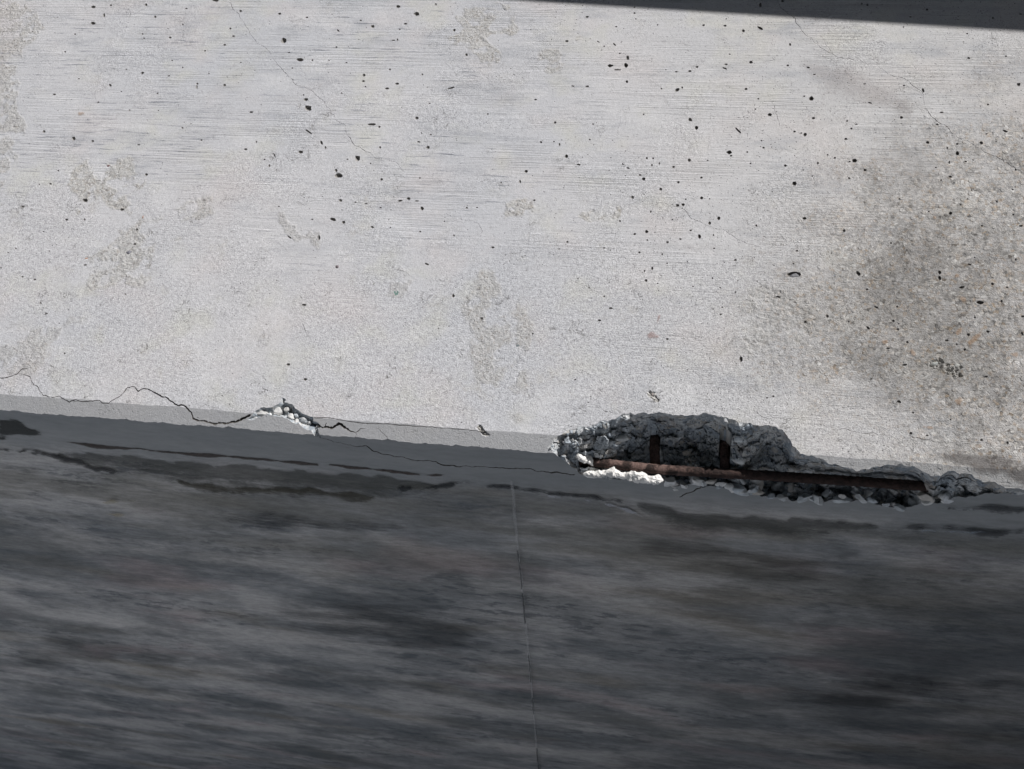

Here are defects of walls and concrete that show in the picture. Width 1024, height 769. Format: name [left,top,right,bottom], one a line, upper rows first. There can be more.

crack [0,368,251,425]
crack [317,417,575,475]
spalling [547,390,1024,512]